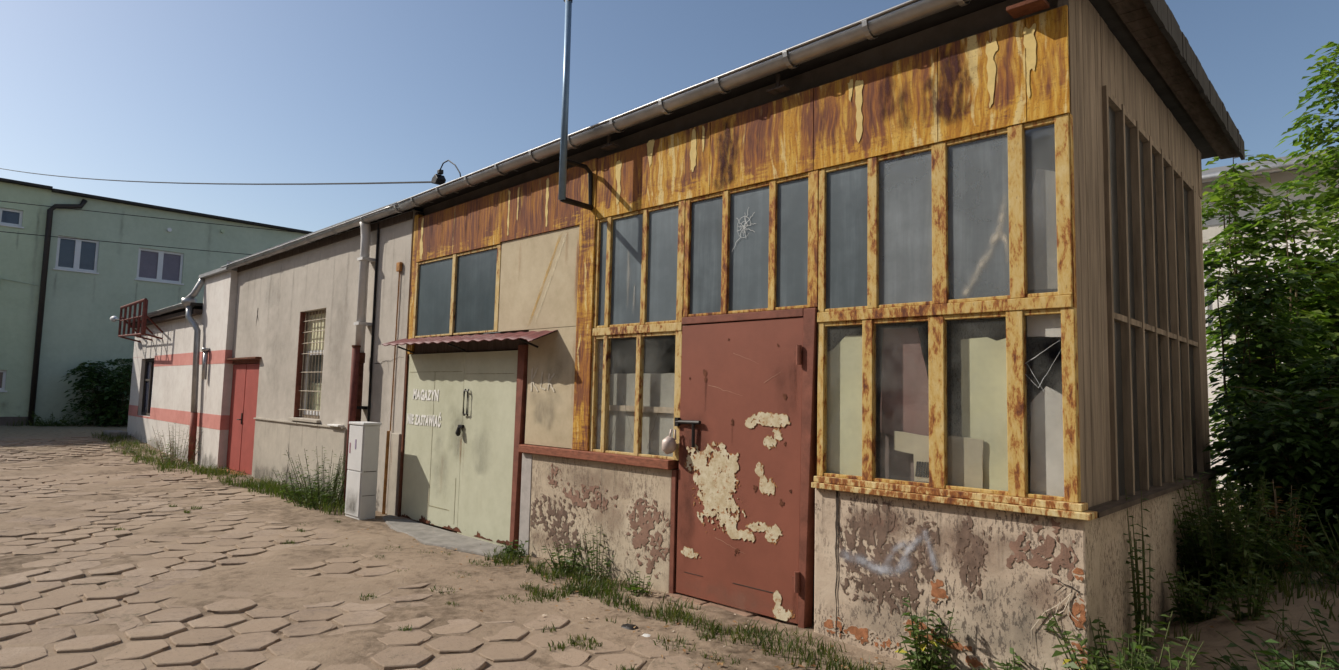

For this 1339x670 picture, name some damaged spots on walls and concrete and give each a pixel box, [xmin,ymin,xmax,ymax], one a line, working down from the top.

corrosion [927,54,970,121]
corrosion [715,123,736,186]
peeling [530,463,701,578]
peeling [684,411,790,544]
peeling [772,590,795,621]
peeling [824,497,994,670]
peeling [1006,516,1088,670]